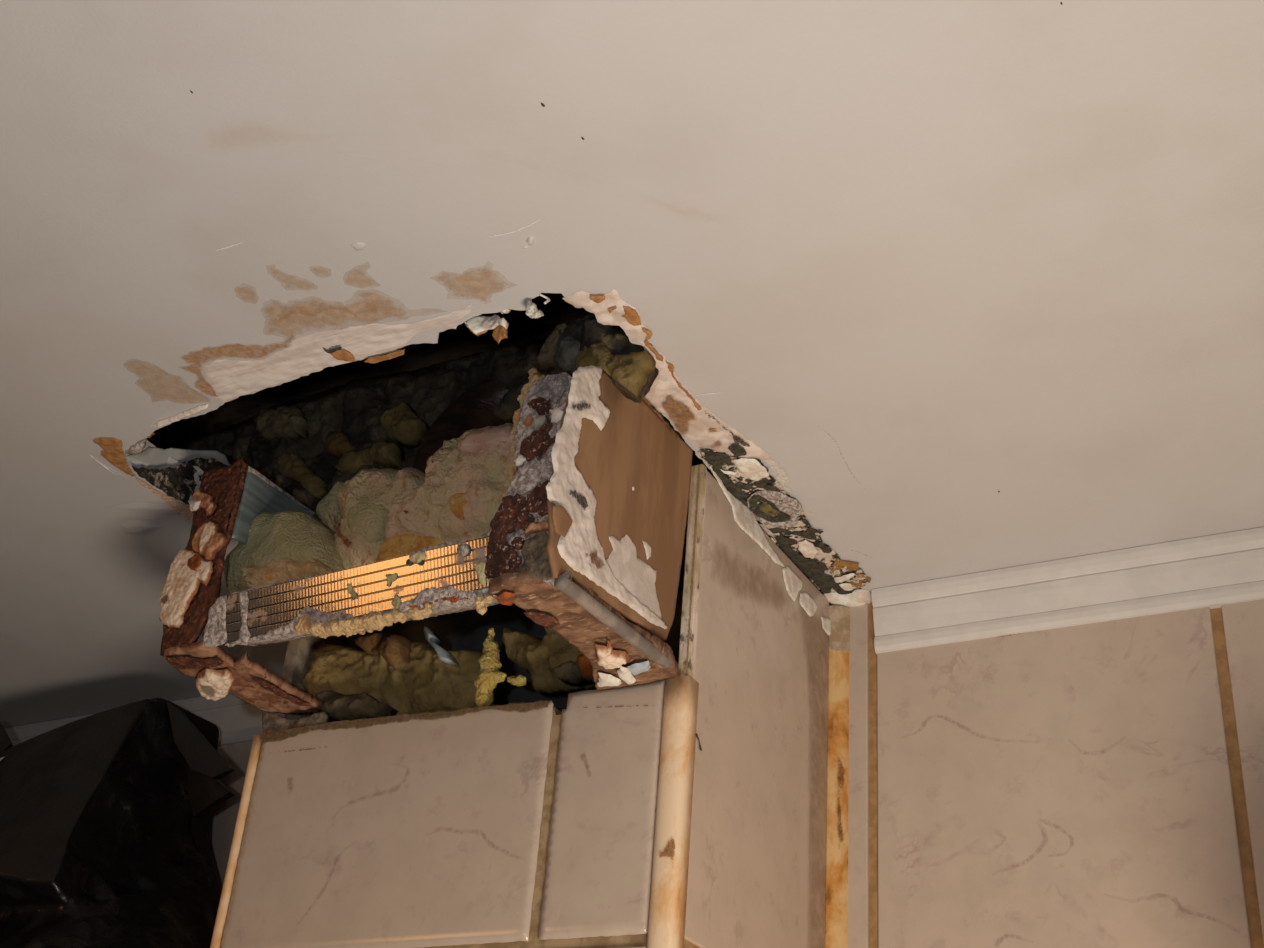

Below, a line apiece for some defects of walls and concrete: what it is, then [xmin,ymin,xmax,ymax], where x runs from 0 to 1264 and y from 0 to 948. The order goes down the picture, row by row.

peeling [466,314,509,344]
peeling [563,289,771,460]
spalling [125,404,209,454]
rust [519,397,556,462]
rust [189,459,241,533]
rust [187,554,201,571]
rust [485,480,552,579]
spalling [553,505,573,538]
peeling [710,467,872,636]
rust [493,592,560,630]
rust [166,656,224,669]
spalling [595,640,651,687]